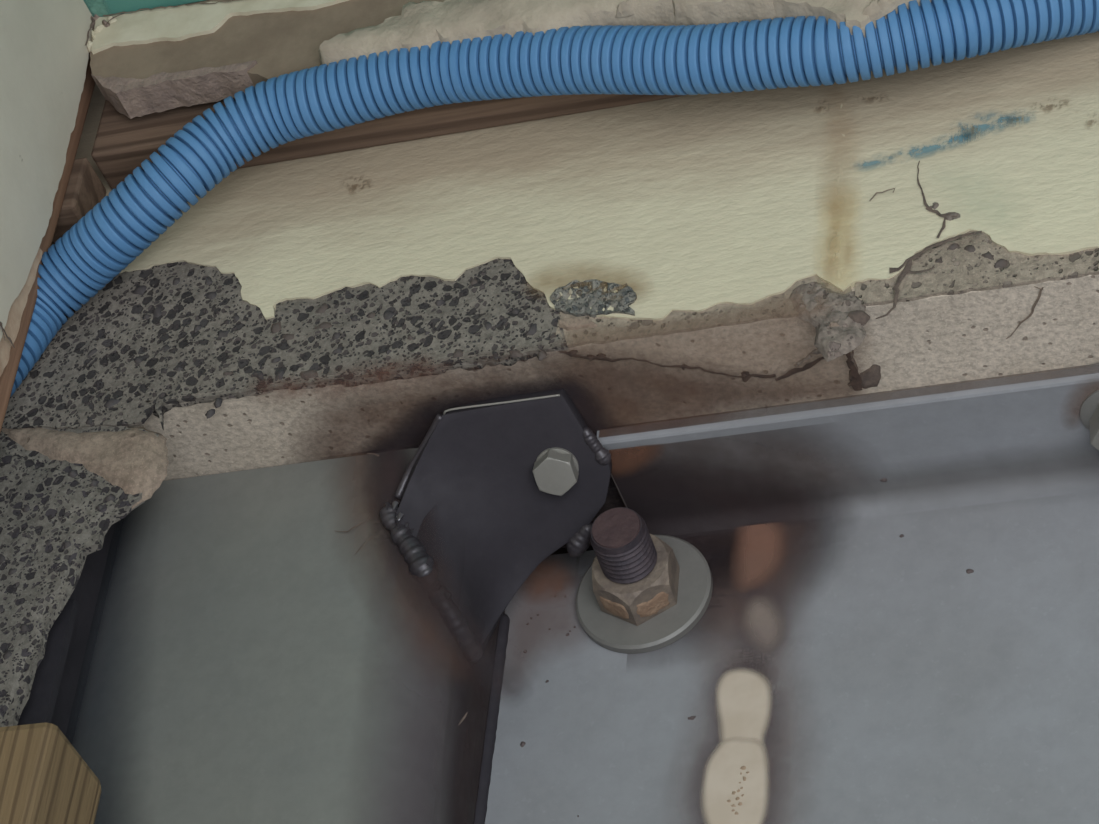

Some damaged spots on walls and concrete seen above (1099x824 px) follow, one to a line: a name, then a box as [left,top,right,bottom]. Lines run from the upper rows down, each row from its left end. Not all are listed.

peeling [85,0,349,54]
spalling [318,0,931,66]
crack [876,161,982,319]
spalling [2,231,1099,430]
crack [1006,286,1044,339]
crack [558,350,862,391]
spalling [18,518,124,744]